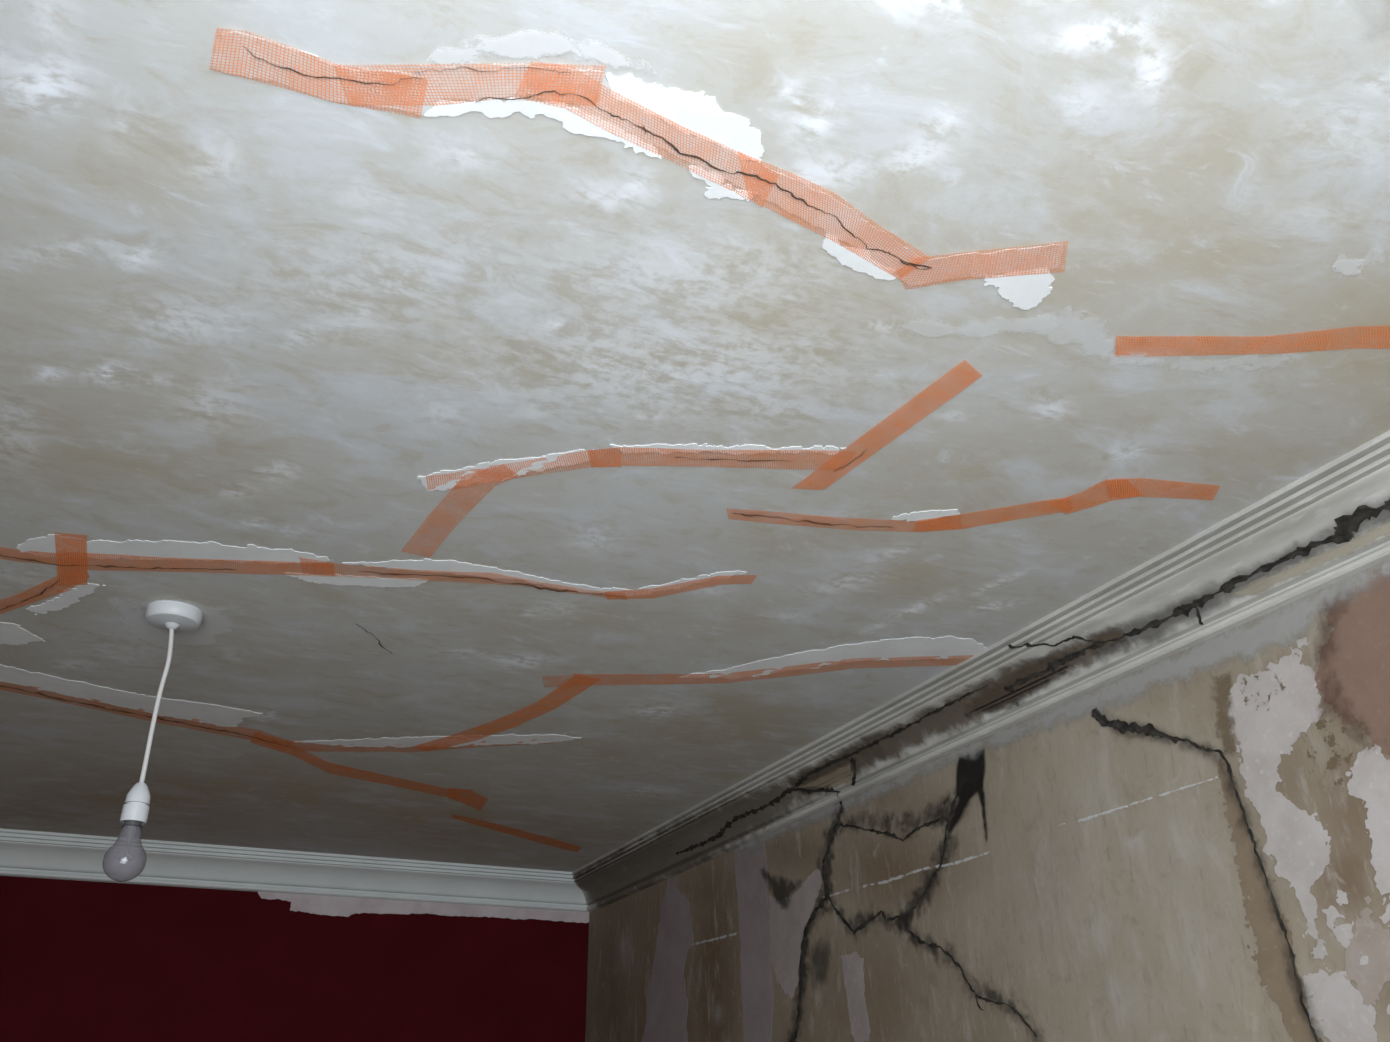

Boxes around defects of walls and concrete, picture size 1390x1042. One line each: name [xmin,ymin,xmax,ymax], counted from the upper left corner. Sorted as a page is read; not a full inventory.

crack [243,46,932,269]
crack [675,455,791,463]
crack [676,499,1390,1042]
peeling [1217,568,1390,1042]